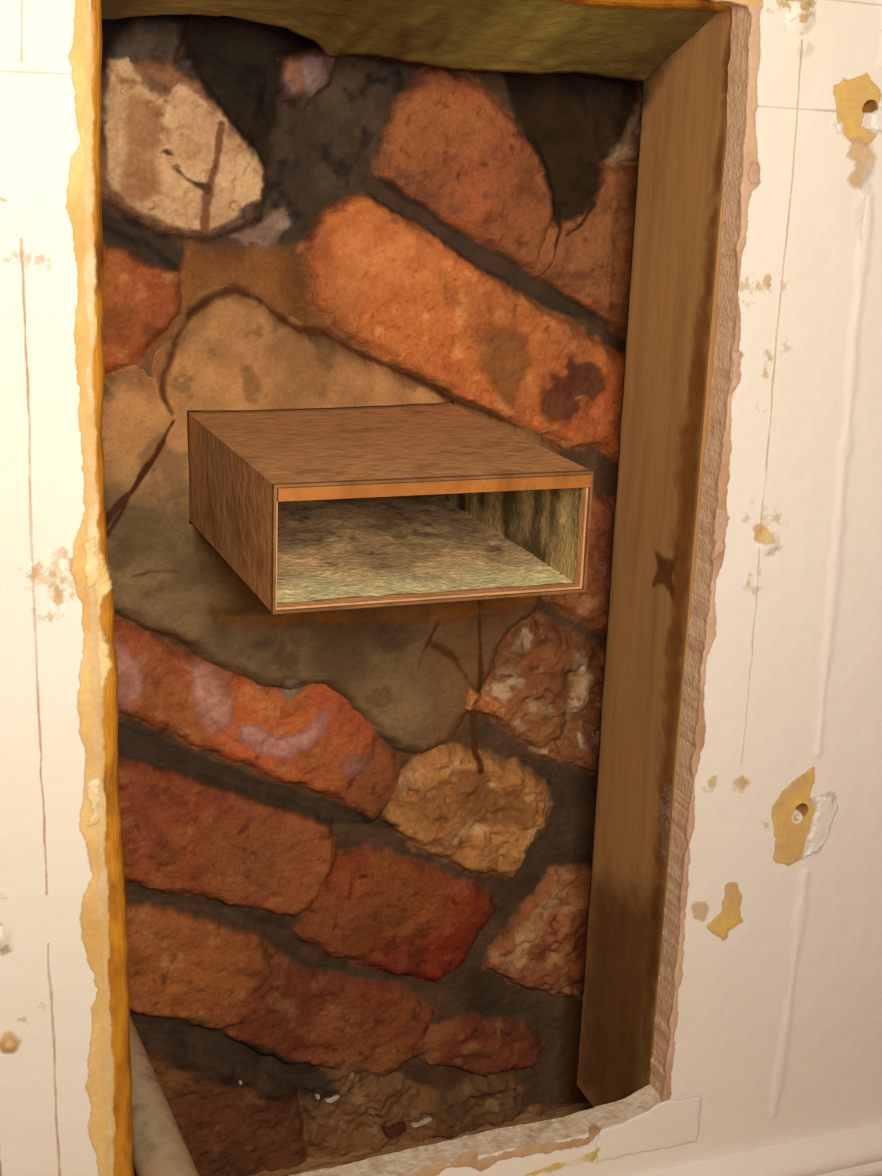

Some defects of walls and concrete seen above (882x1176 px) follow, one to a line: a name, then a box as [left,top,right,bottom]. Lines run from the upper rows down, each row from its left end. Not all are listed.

spalling [834,73,882,187]
crack [21,250,31,491]
spalling [482,329,527,403]
spalling [542,357,605,420]
peeling [66,0,116,1176]
peeling [662,0,763,1102]
crack [426,602,484,774]
spalling [466,689,506,718]
crack [37,686,47,894]
spalling [772,767,838,866]
crack [54,1119,62,1176]
peeling [398,1124,601,1176]